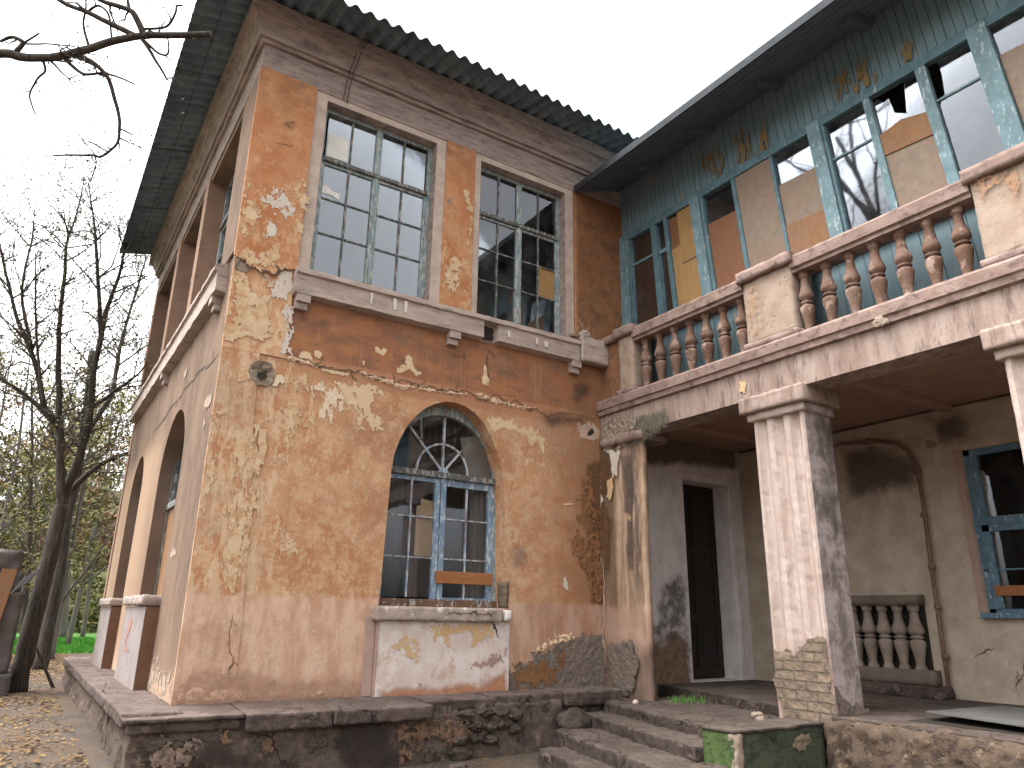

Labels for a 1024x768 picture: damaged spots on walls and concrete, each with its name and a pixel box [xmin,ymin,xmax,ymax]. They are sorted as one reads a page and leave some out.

peeling [833,56,877,103]
peeling [974,165,1022,201]
peeling [200,176,547,601]
crack [286,354,597,419]
spalling [569,414,636,604]
crack [227,616,238,674]
peeling [391,635,420,662]
peeling [427,622,494,648]
spalling [471,632,639,704]
damp [654,633,691,698]
flaking render [772,636,871,727]